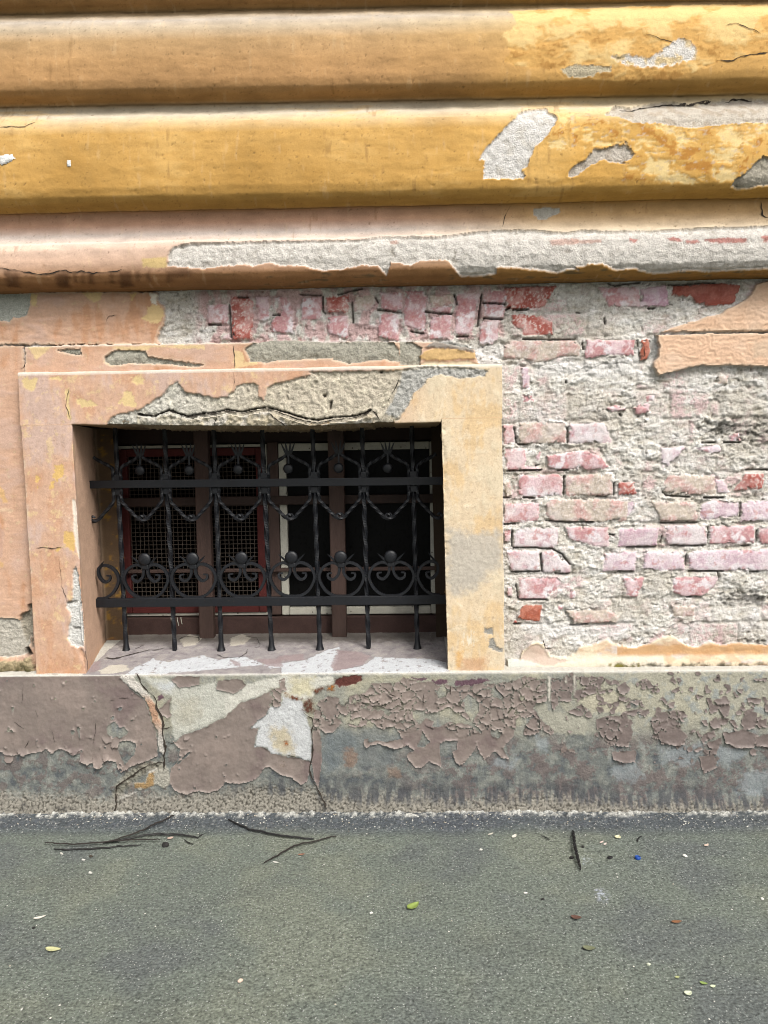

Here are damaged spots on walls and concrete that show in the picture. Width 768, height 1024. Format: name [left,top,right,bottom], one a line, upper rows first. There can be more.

peeling [502,3,768,84]
peeling [480,98,768,190]
crack [139,380,399,426]
spalling [0,206,768,799]
crack [85,636,200,811]
crack [288,710,327,810]